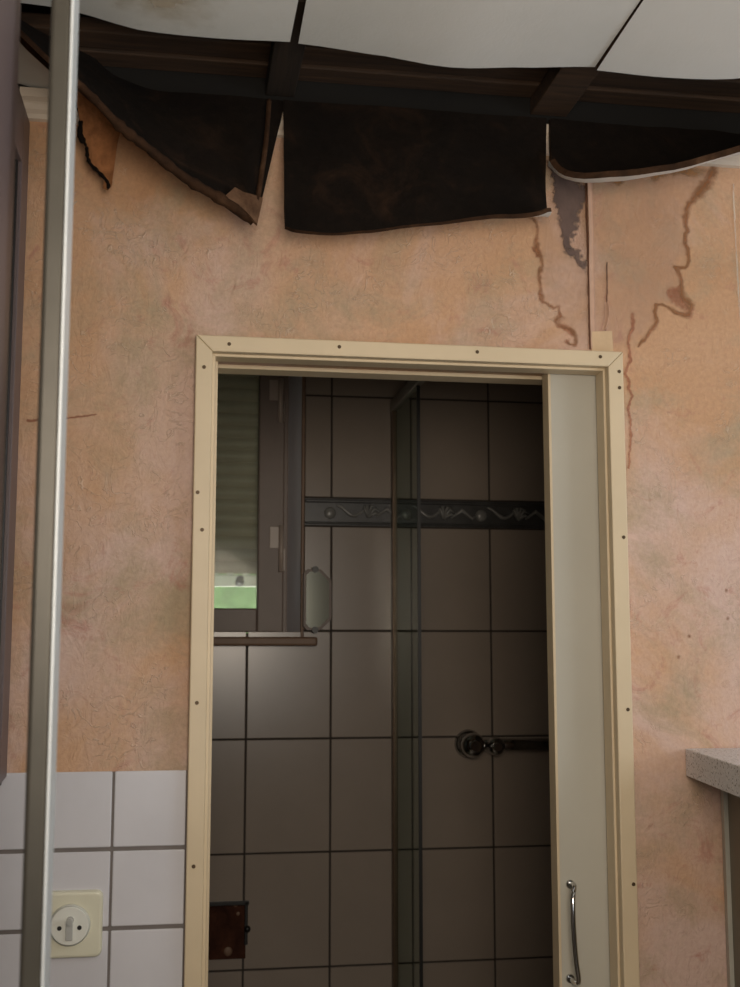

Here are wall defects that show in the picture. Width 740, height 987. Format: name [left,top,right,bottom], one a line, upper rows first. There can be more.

water stain [548,166,587,269]
water stain [532,218,577,346]
water stain [624,167,716,469]